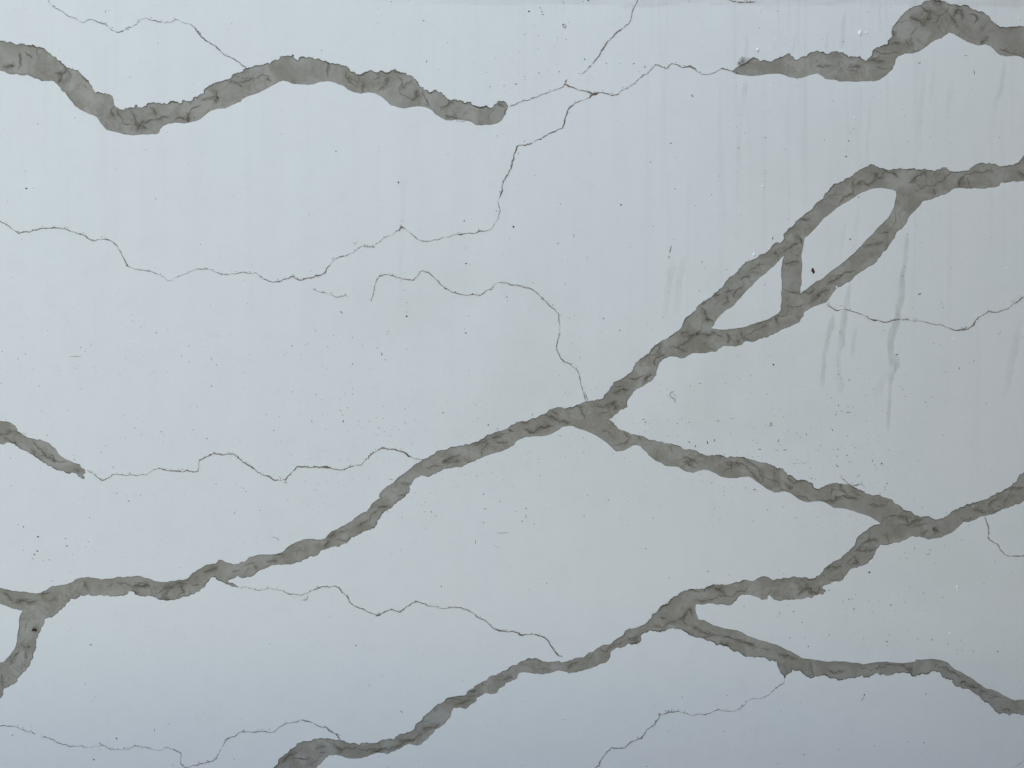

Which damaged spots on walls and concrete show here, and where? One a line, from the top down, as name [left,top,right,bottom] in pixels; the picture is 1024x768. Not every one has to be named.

crack [0,0,1024,297]
crack [0,156,1024,768]